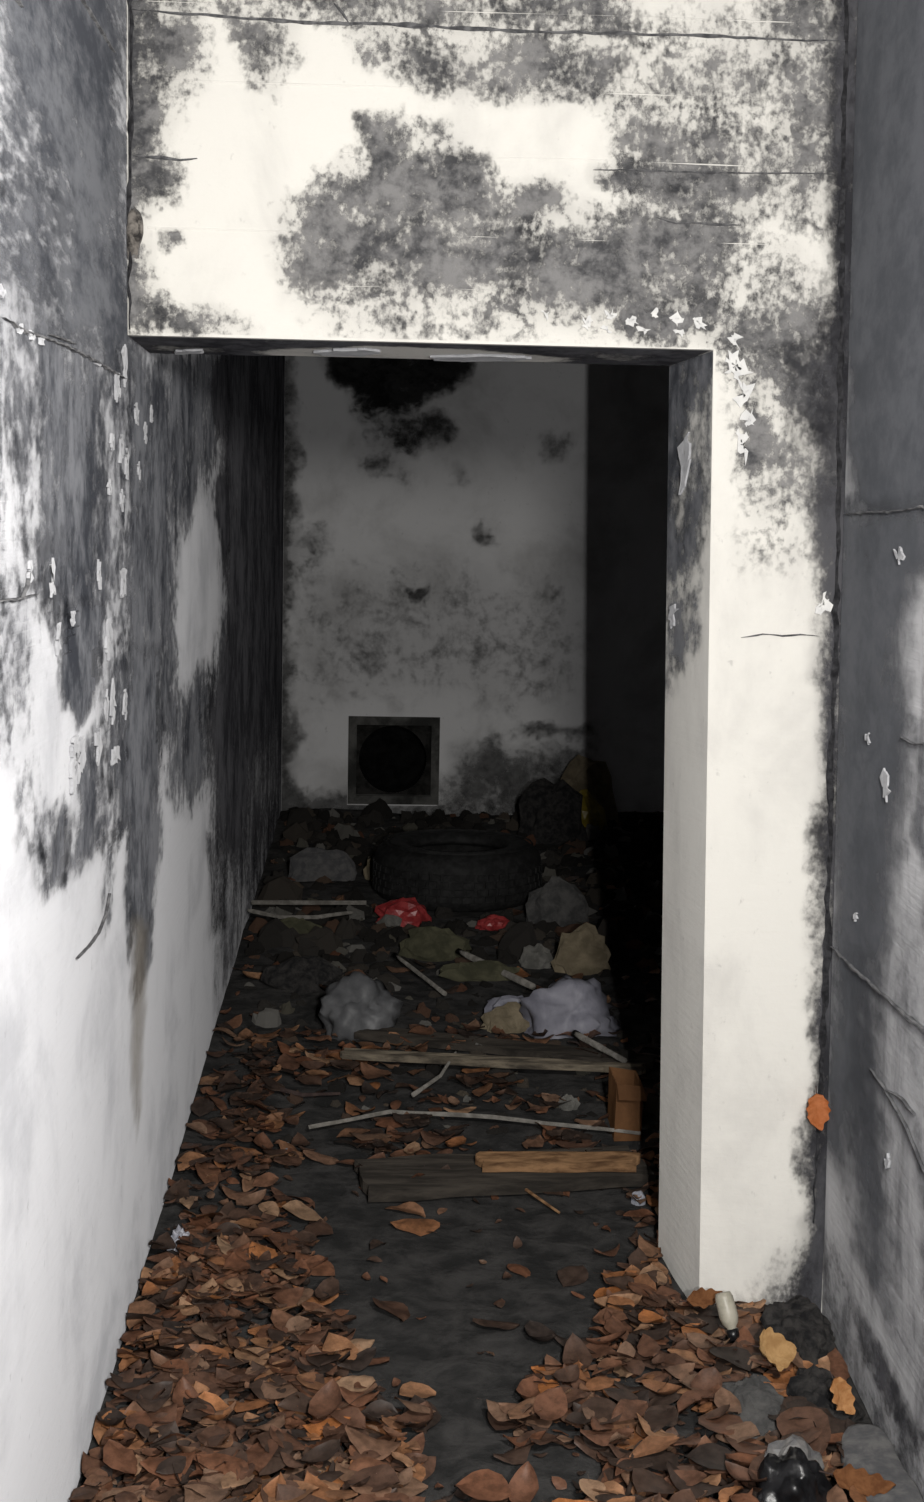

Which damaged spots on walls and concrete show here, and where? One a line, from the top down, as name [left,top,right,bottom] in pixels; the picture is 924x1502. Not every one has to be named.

peeling [582,308,707,338]
peeling [725,333,756,466]
damp [0,0,713,1069]
peeling [26,558,56,598]
peeling [96,559,127,598]
peeling [54,611,76,655]
peeling [104,618,113,660]
crack [741,631,816,639]
damp [278,0,924,1323]
peeling [69,678,128,794]
damp [855,1313,924,1490]